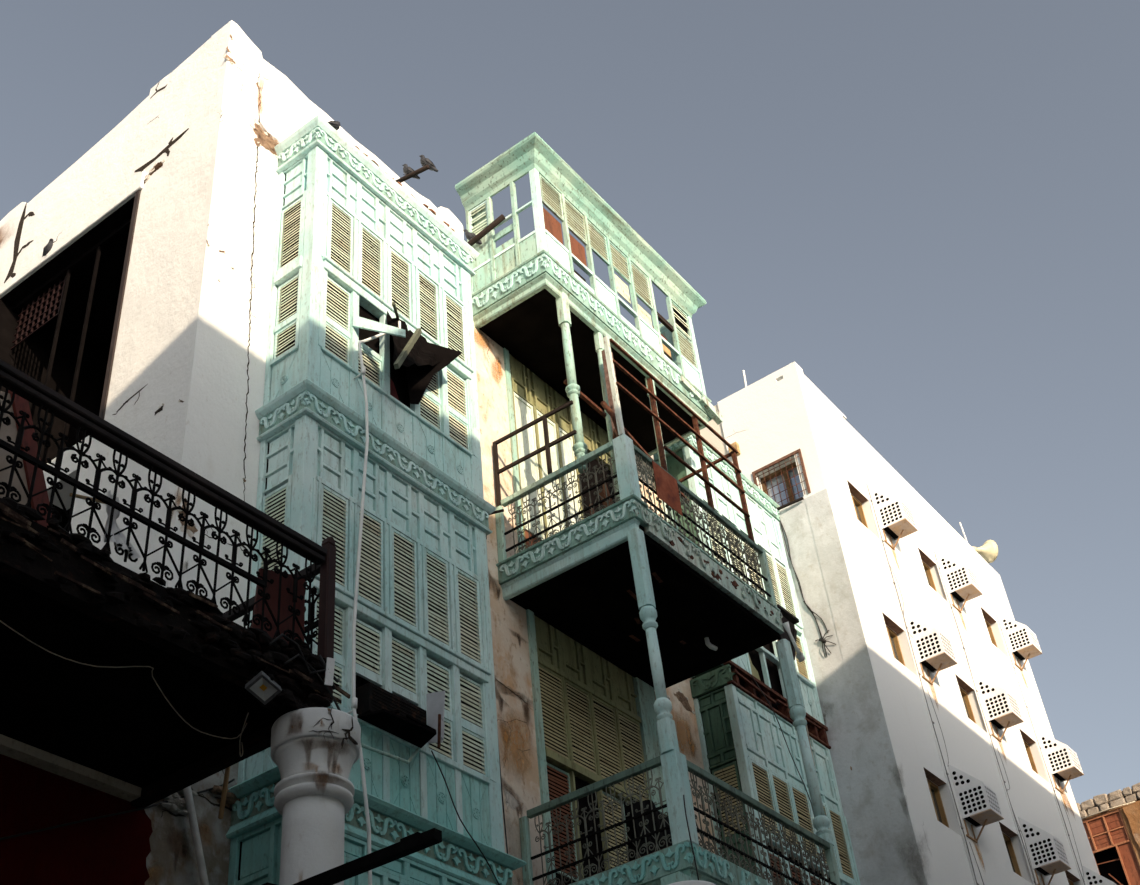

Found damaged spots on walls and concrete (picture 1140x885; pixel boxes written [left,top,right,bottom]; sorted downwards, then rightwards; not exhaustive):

crack [135,81,189,172]
spalling [249,119,279,159]
crack [219,69,269,501]
crack [309,700,358,748]